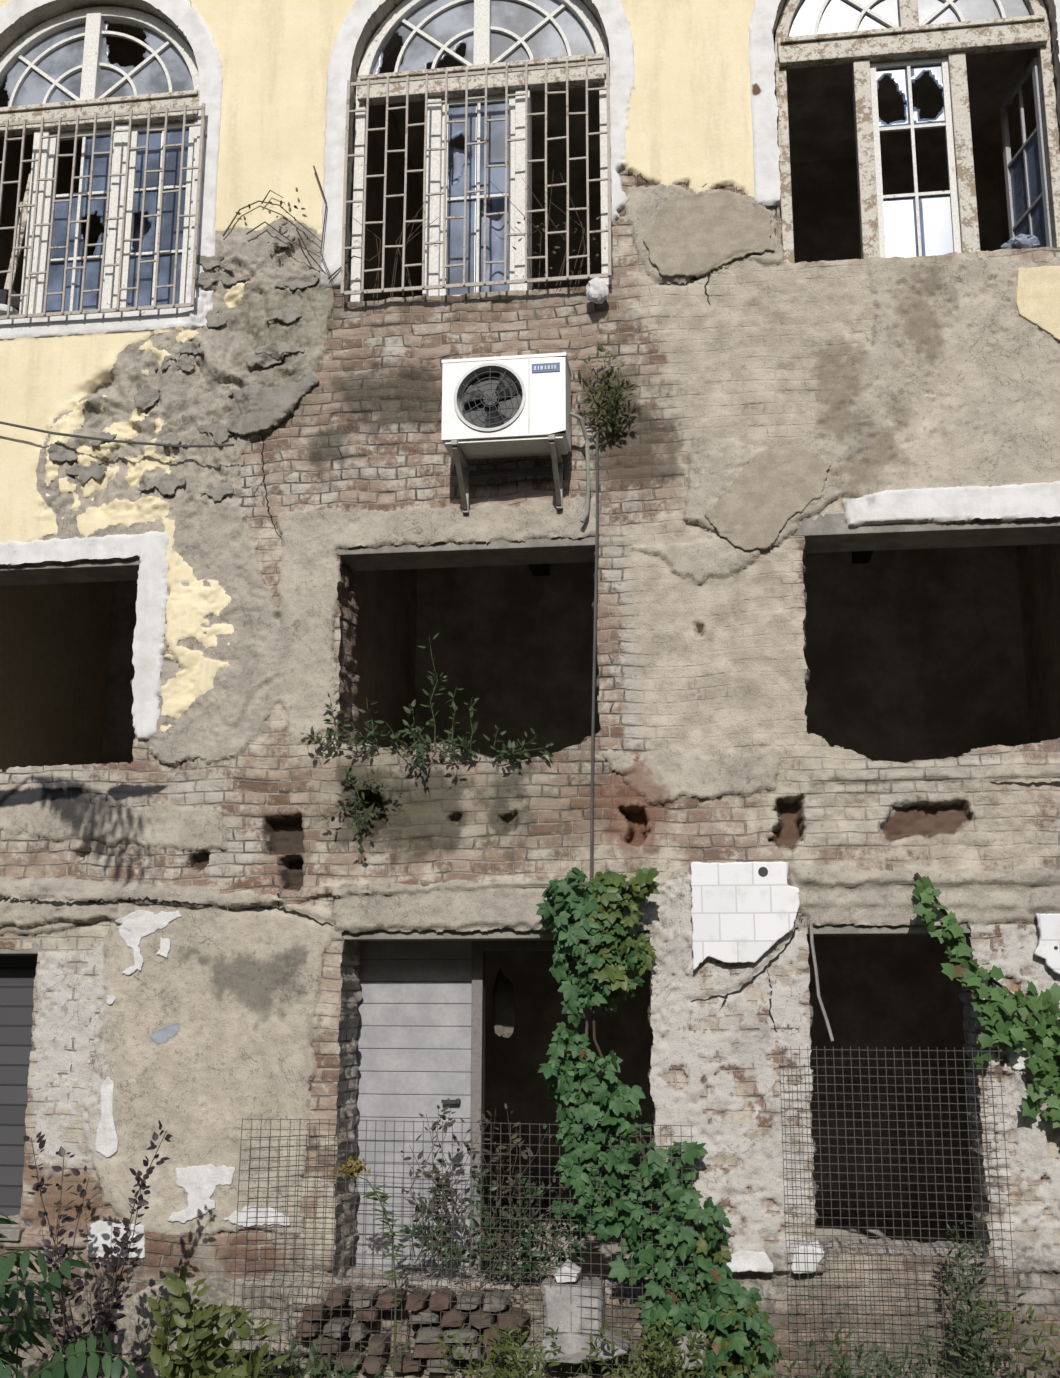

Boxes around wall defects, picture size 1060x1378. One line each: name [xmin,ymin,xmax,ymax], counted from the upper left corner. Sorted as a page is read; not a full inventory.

peeling [0,218,606,1378]
spalling [232,178,1060,1297]
crack [690,918,803,1032]
crack [990,780,1060,788]